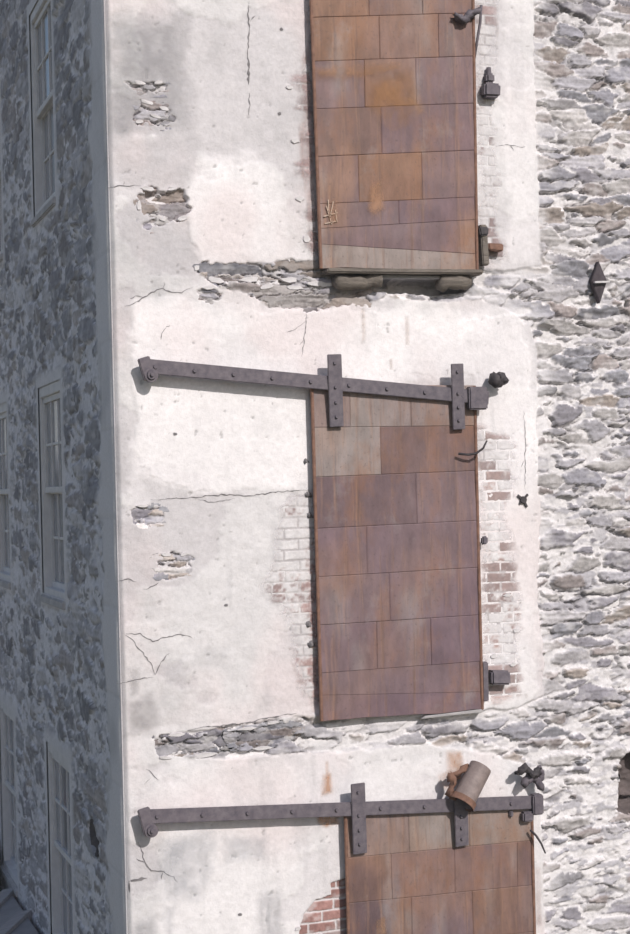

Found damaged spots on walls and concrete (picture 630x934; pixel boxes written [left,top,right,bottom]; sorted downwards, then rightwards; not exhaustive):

crack [247,5,255,115]
spalling [126,80,176,131]
spalling [133,186,191,234]
spalling [193,214,372,313]
spalling [131,503,169,529]
spalling [151,552,195,581]
flaking render [265,491,319,701]
crack [116,633,192,684]
spalling [152,719,305,759]
crack [128,845,176,892]
flaking render [295,878,347,934]